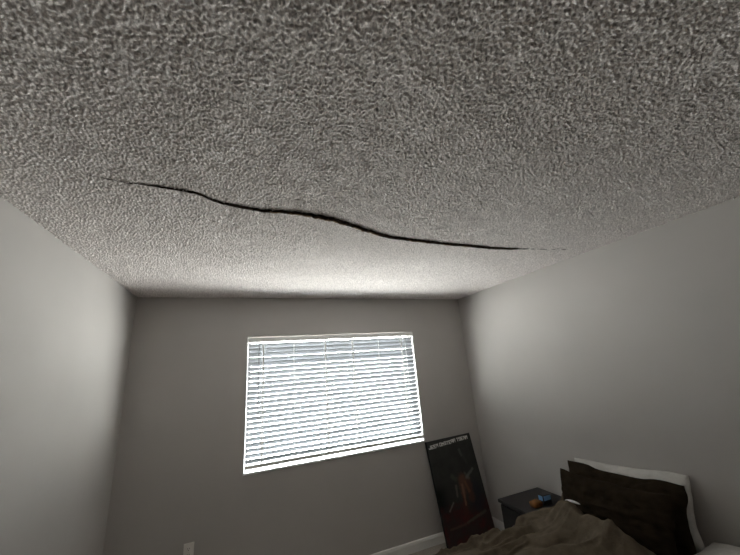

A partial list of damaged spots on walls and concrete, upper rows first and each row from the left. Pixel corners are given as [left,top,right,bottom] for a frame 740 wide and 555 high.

crack [89,175,566,250]